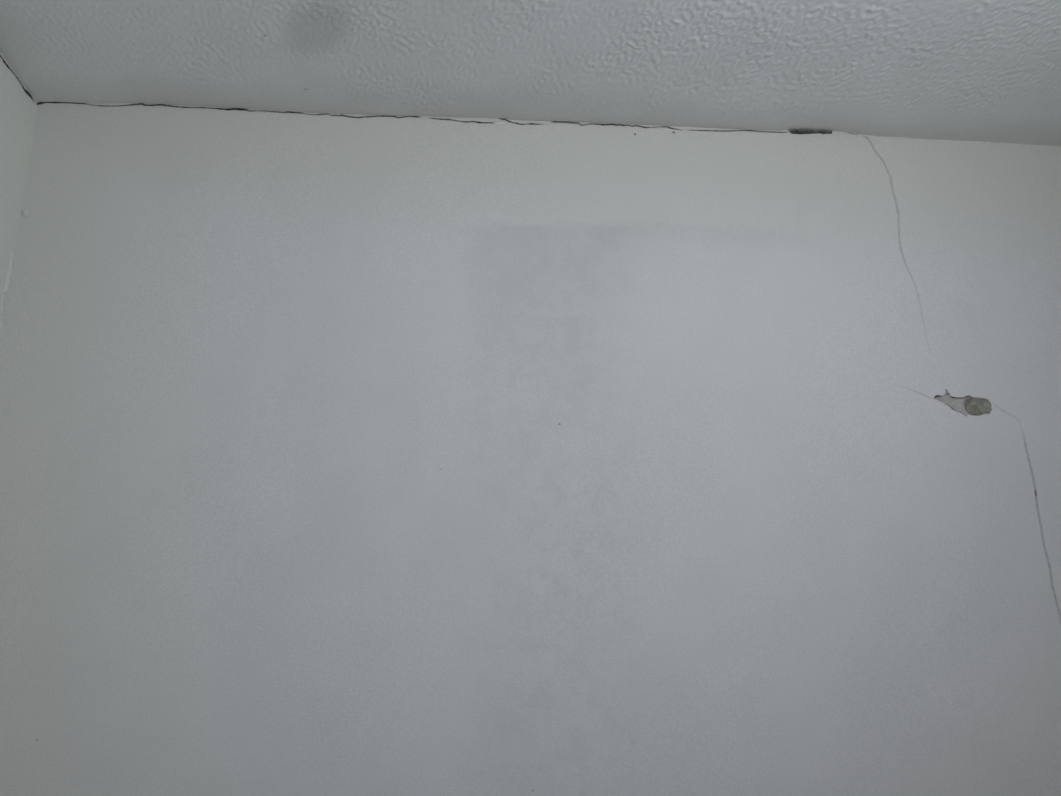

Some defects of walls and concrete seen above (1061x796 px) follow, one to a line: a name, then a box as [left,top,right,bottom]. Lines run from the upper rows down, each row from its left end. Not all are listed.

crack [0,55,787,133]
flaking render [933,389,994,417]